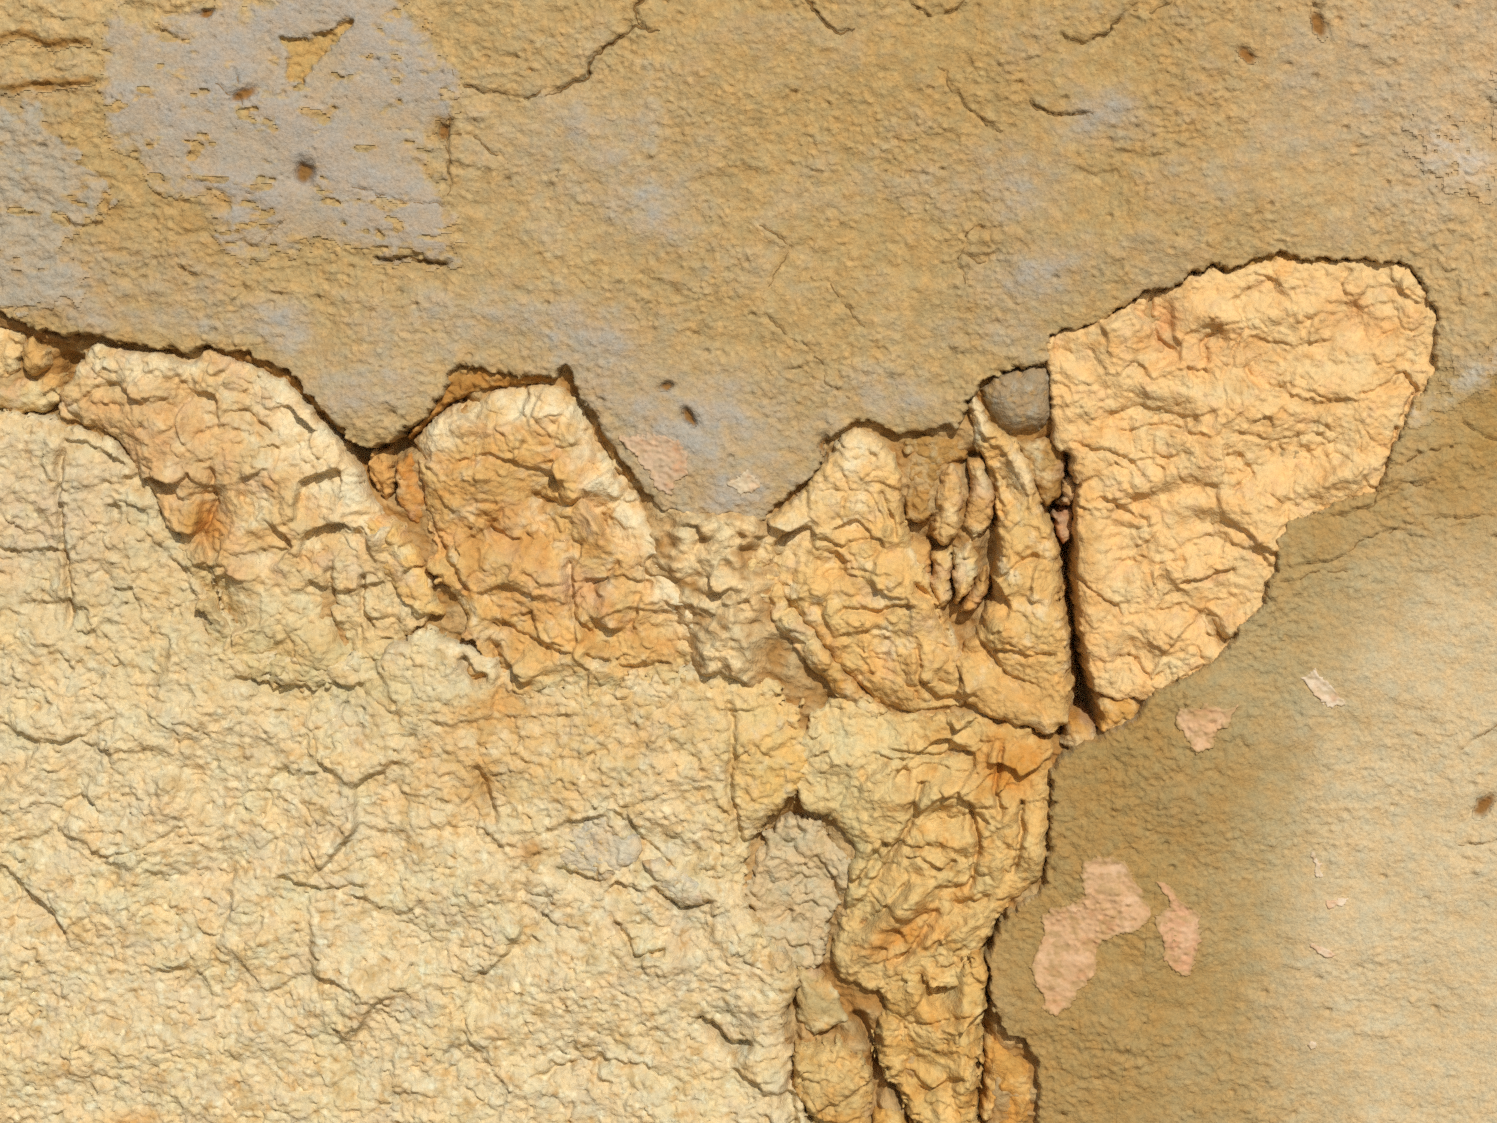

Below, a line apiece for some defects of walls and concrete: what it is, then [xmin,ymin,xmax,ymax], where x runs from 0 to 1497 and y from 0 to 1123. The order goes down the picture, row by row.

crack [911,0,964,16]
crack [1070,1,1172,42]
crack [938,66,1002,132]
crack [1030,100,1094,116]
spalling [1222,251,1331,273]
spalling [210,345,346,434]
spalling [408,365,557,440]
spalling [598,425,653,498]
peeling [1154,881,1203,977]